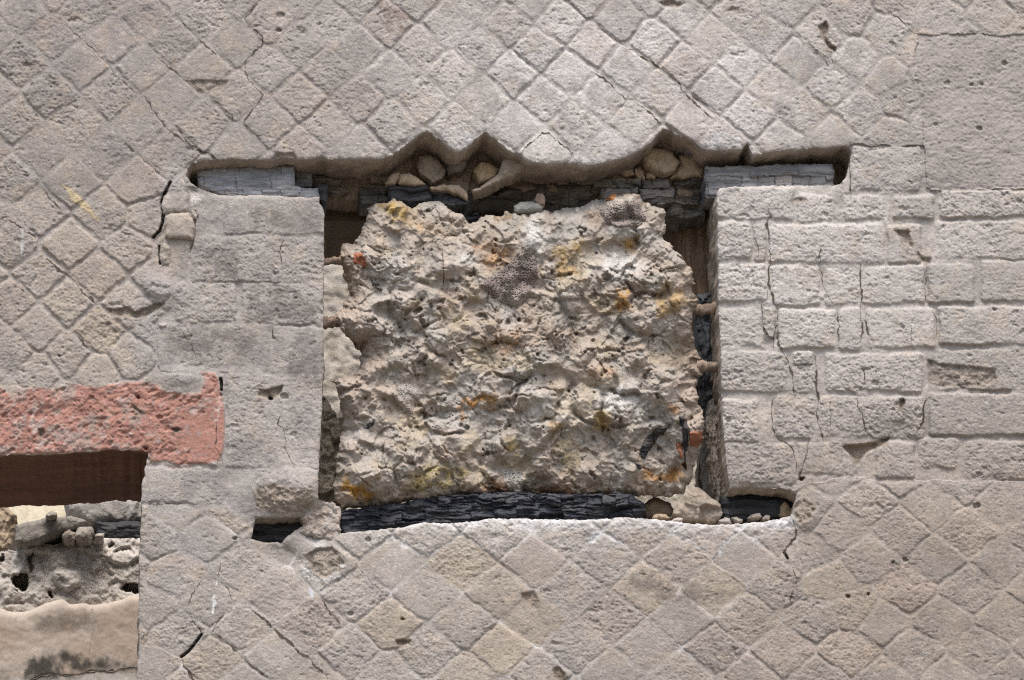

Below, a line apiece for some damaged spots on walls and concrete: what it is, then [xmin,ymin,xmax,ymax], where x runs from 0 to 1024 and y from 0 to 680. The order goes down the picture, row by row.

spalling [818,23,836,51]
crack [124,141,170,264]
crack [752,202,832,479]
spalling [927,360,996,389]
crack [182,563,329,680]
crack [784,520,798,607]